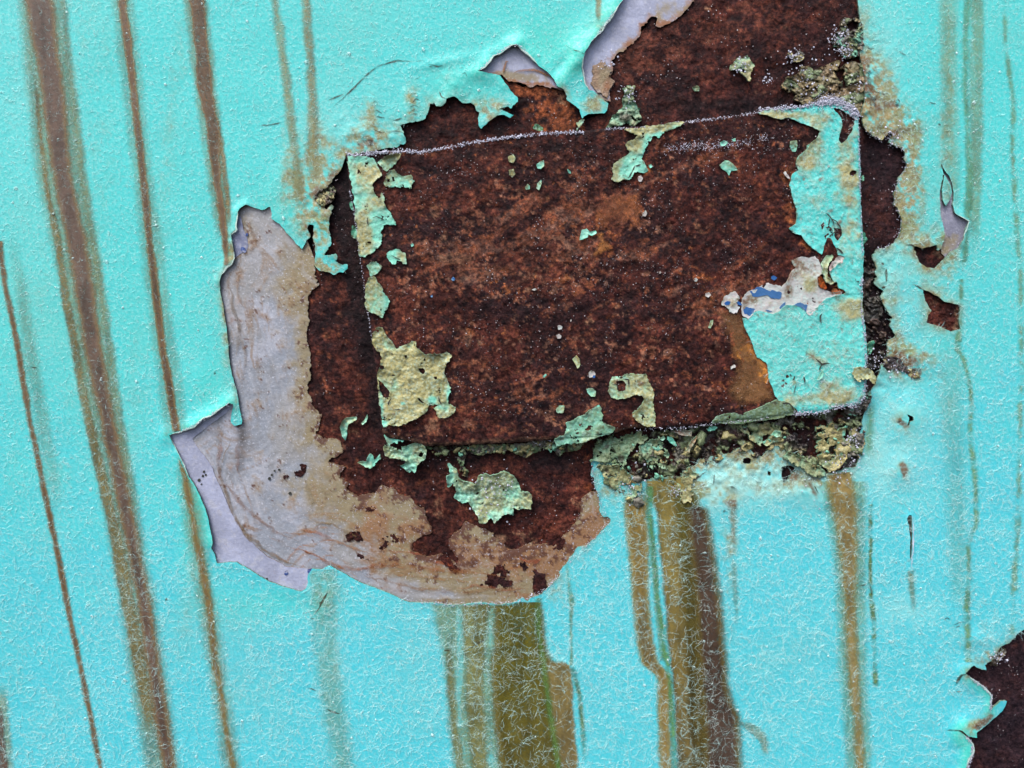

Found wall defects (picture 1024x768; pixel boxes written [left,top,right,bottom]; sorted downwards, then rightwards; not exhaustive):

corrosion [188,0,230,265]
peeling [479,44,563,91]
peeling [582,0,694,182]
corrosion [0,241,102,768]
corrosion [24,0,180,768]
corrosion [179,460,236,768]
peeling [170,205,610,604]
peeling [347,153,456,473]
peeling [554,355,656,446]
corrosion [307,0,921,768]
peeling [712,399,796,424]
corrosion [962,630,1024,768]